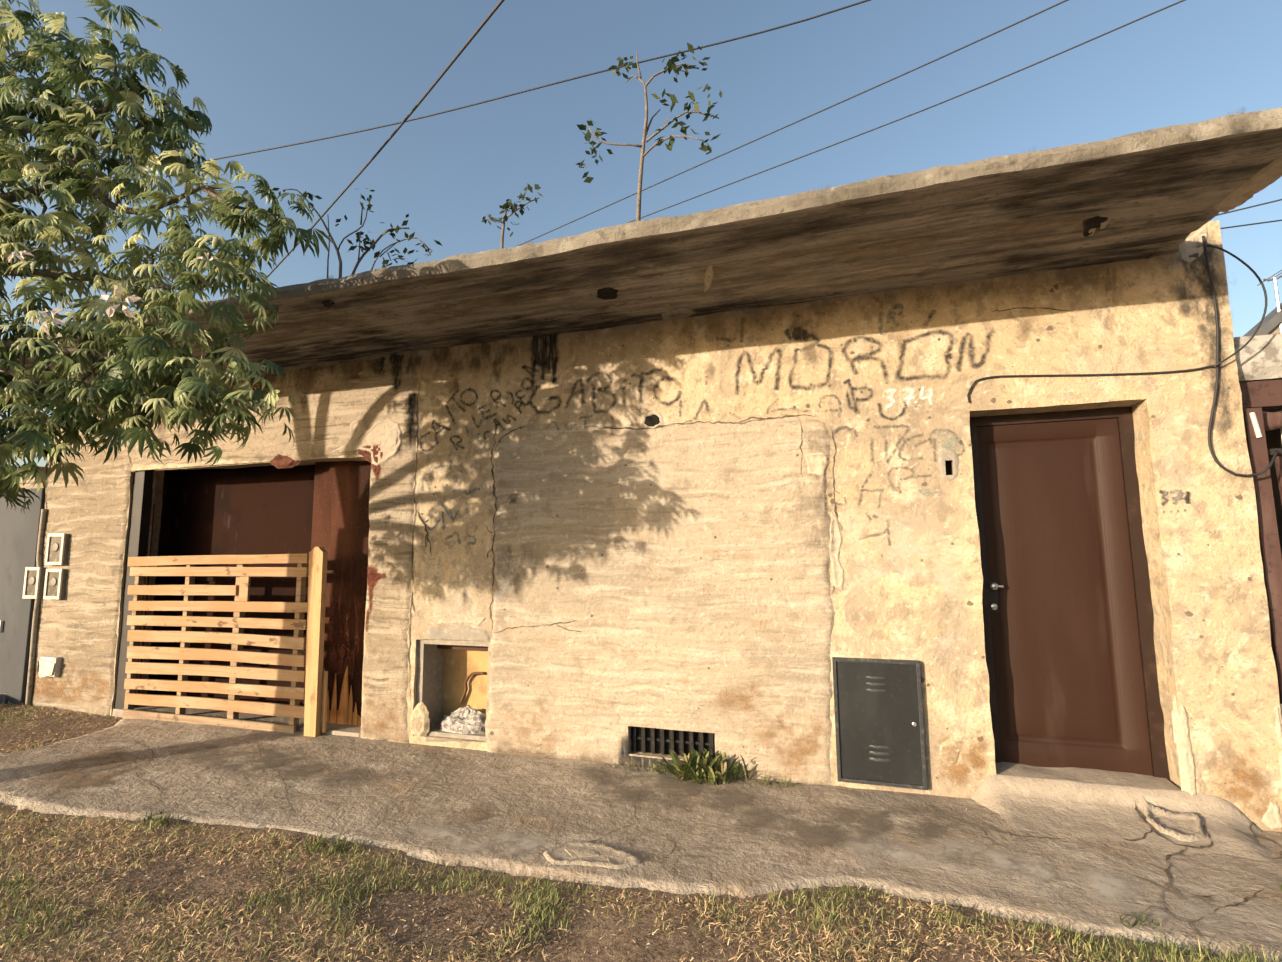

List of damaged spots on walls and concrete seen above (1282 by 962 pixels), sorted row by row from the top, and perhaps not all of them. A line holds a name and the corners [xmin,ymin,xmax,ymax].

water stain [1000,146,1250,234]
water stain [691,217,944,316]
water stain [1004,227,1172,273]
water stain [215,250,673,442]
water stain [785,327,807,340]
corrosion [366,445,383,480]
crack [486,426,582,635]
corrosion [366,567,386,631]
crack [1125,802,1212,849]